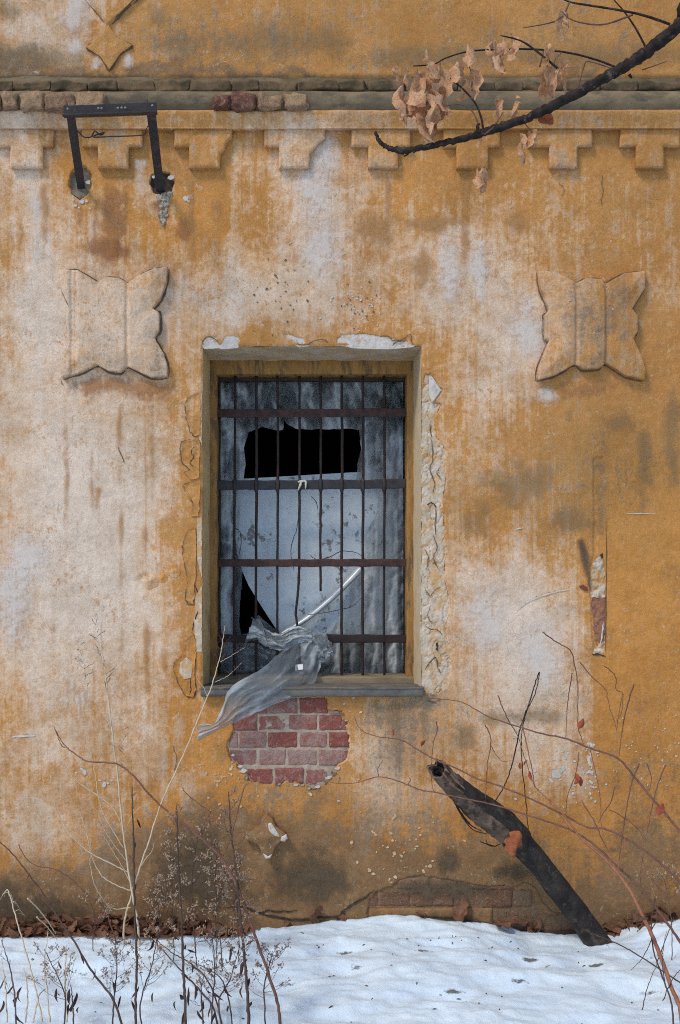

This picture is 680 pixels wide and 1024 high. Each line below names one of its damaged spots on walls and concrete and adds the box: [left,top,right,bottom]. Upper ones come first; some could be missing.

flaking render [70,168,92,209]
flaking render [150,173,193,229]
peeling [202,336,240,349]
peeling [253,259,415,349]
flaking render [173,392,202,698]
flaking render [419,375,451,694]
flaking render [198,696,364,808]
damp [0,882,84,923]
damp [149,831,233,912]